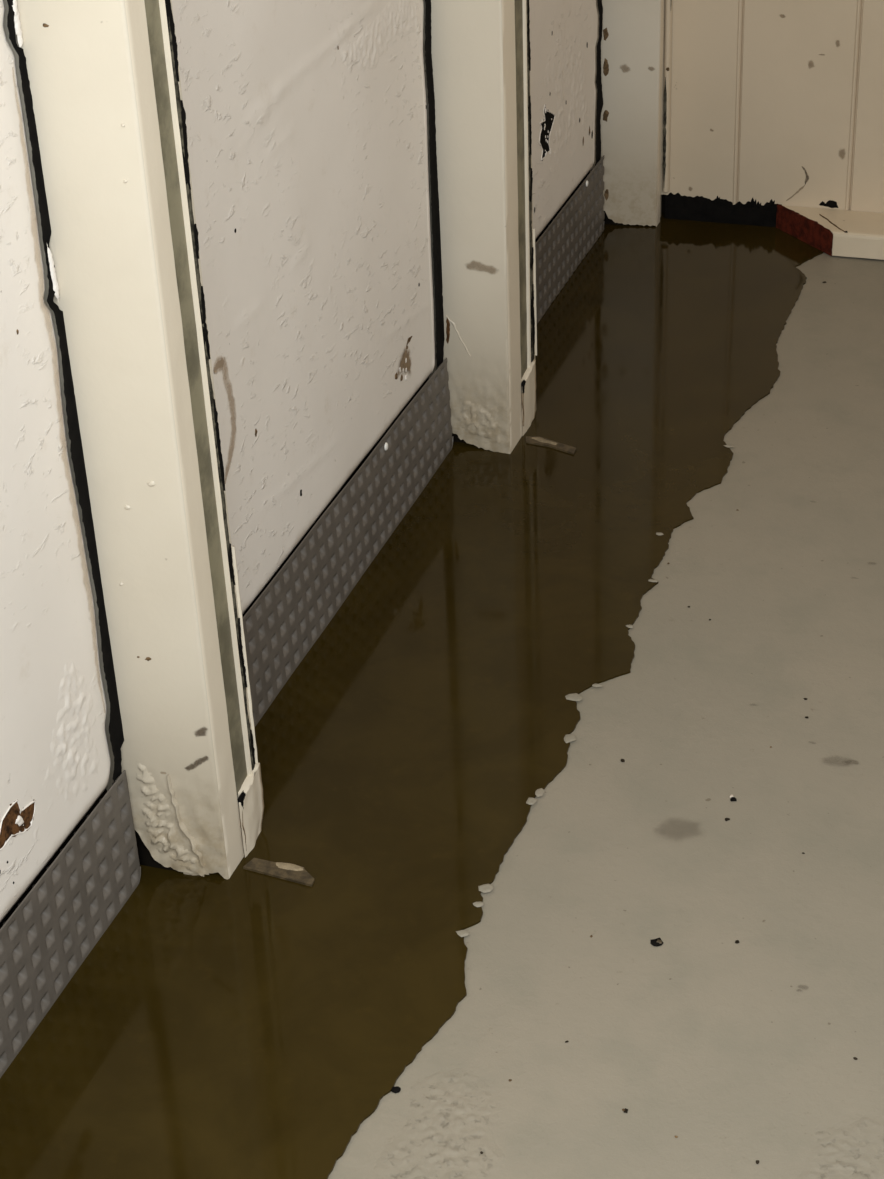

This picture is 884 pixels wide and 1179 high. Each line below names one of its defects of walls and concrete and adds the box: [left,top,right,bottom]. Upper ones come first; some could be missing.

peeling [526,0,556,362]
spalling [395,336,412,381]
damp [214,359,236,483]
peeling [0,799,36,873]